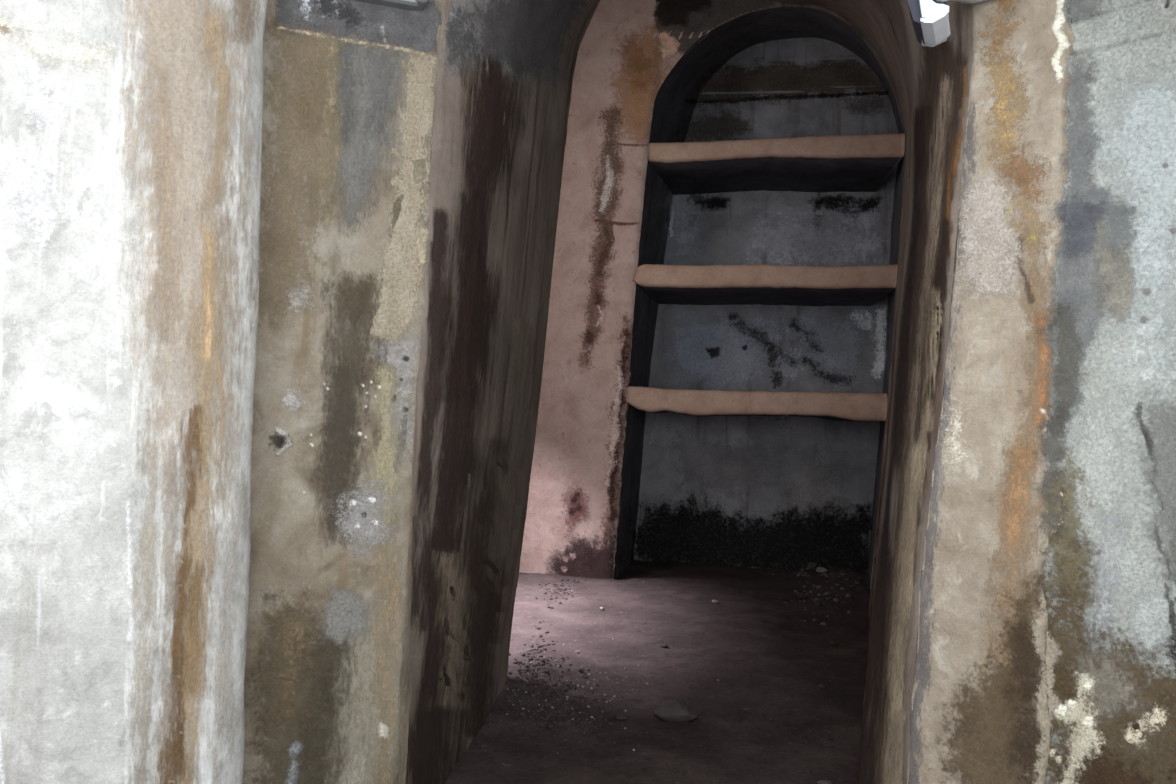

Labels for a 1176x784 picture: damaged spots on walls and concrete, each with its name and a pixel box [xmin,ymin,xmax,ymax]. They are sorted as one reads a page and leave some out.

damp [123,0,532,784]
rust [610,26,667,142]
damp [546,0,1176,784]
rust [988,234,1057,673]
flaking render [1040,0,1176,784]